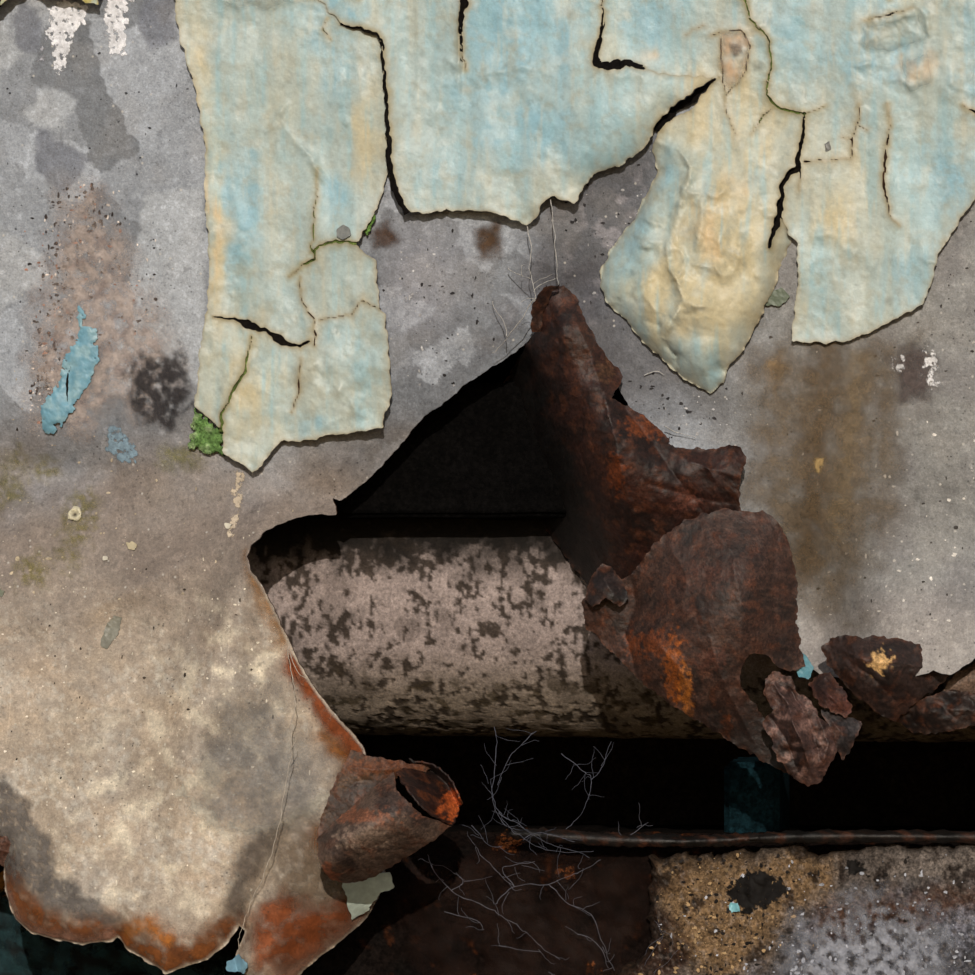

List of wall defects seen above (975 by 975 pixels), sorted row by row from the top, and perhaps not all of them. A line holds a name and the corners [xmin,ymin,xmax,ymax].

crack [458,0,469,62]
crack [593,0,643,70]
crack [323,23,410,215]
crack [654,0,861,248]
peeling [175,0,975,473]
peeling [41,306,100,434]
crack [215,303,317,432]
rust [530,286,560,332]
water stain [748,348,905,598]
rust [581,508,805,777]
rust [0,857,236,971]
rust [254,897,364,975]